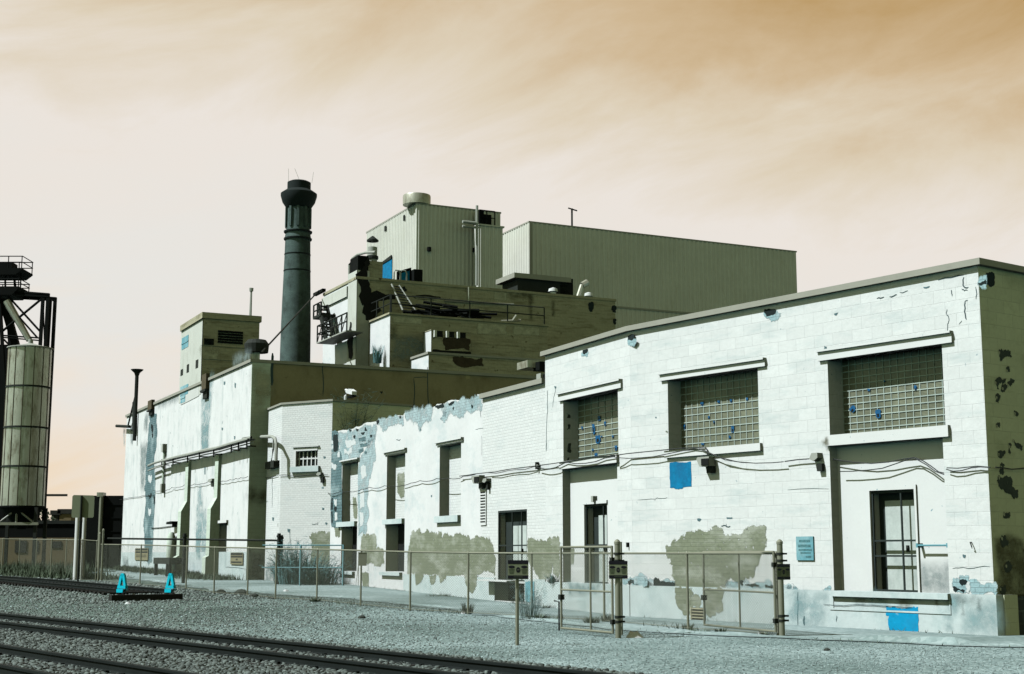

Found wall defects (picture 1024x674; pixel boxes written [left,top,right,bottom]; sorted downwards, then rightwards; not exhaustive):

crack [939,275,977,331]
peeling [995,348,1015,402]
spalling [322,396,482,536]
peeling [997,439,1023,499]
spalling [726,579,798,590]
spalling [952,561,1012,595]